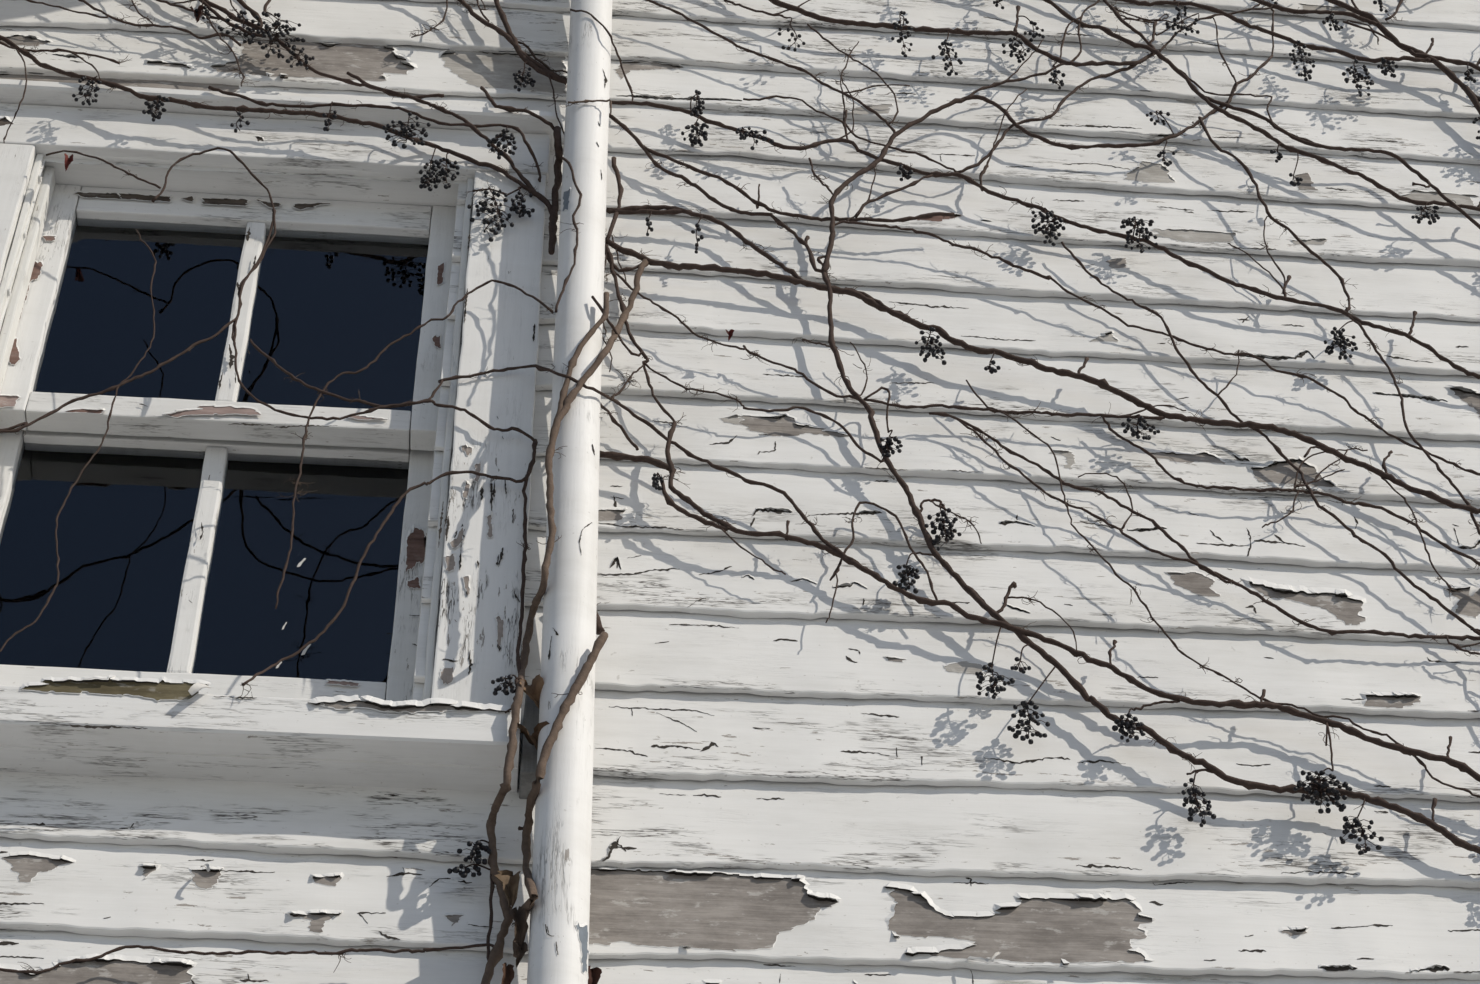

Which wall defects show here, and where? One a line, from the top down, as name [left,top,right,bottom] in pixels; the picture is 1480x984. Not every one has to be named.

peeling [0,33,418,93]
peeling [439,47,568,94]
peeling [1444,384,1480,419]
peeling [1147,450,1226,464]
peeling [1246,455,1338,488]
peeling [405,524,427,589]
peeling [1241,576,1369,626]
peeling [19,675,211,701]
peeling [1,851,76,883]
peeling [575,867,842,974]
peeling [884,882,1156,965]
peeling [0,954,198,984]